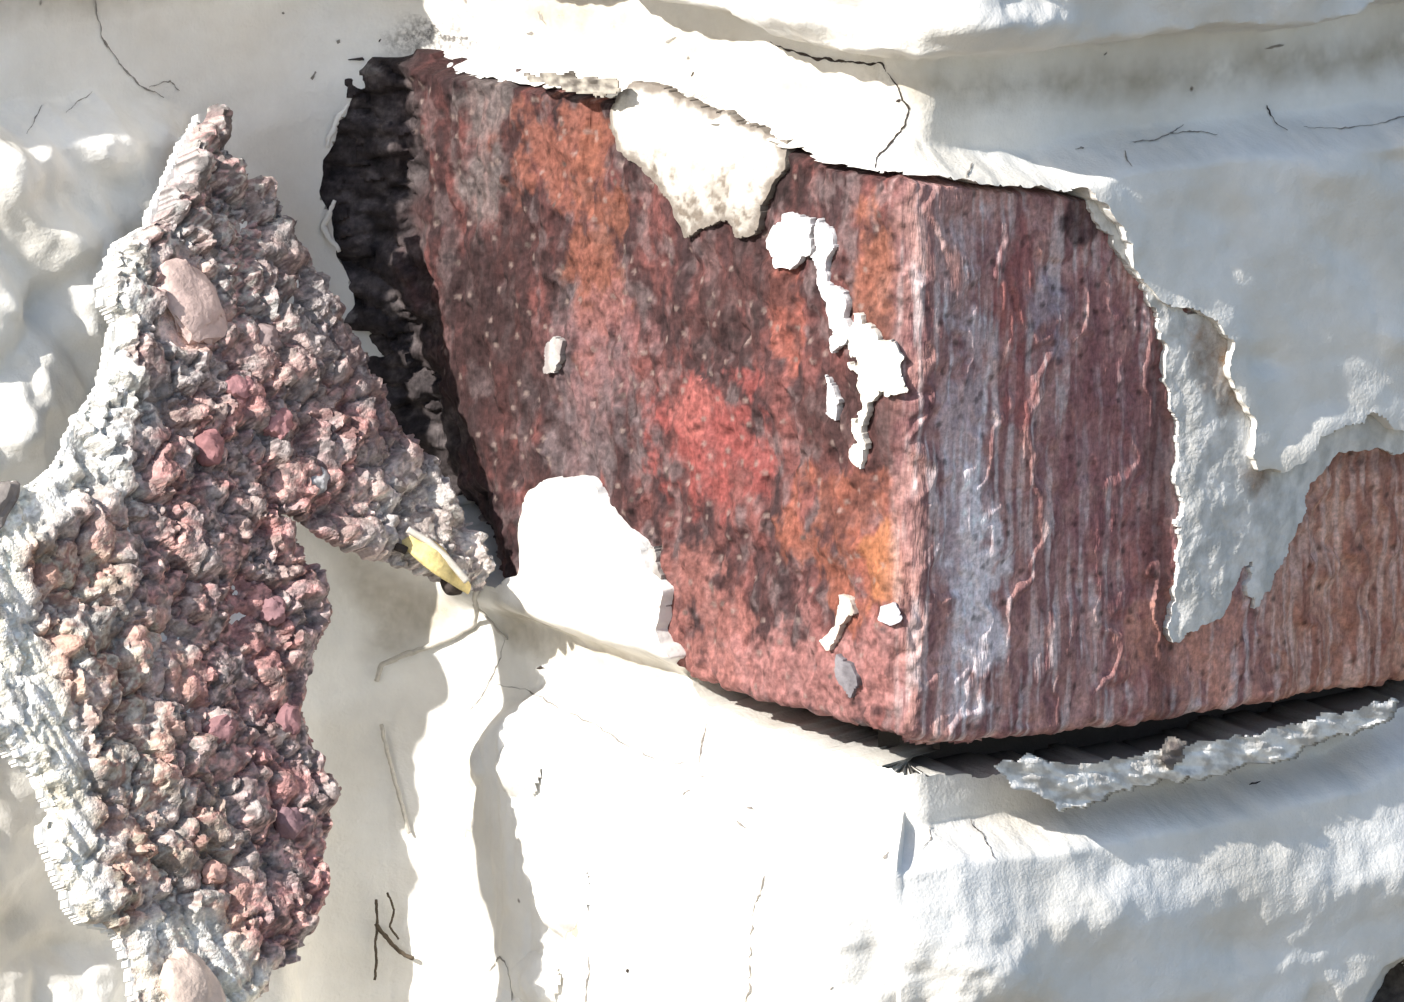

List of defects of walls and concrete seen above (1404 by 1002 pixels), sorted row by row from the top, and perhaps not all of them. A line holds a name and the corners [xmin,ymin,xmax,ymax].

crack [95,0,180,98]
crack [770,42,910,168]
spalling [319,49,1404,745]
rust [1212,347,1228,367]
peeling [0,103,496,1002]
crack [468,641,706,765]
peeling [994,698,1399,812]
peeling [1372,959,1404,1002]